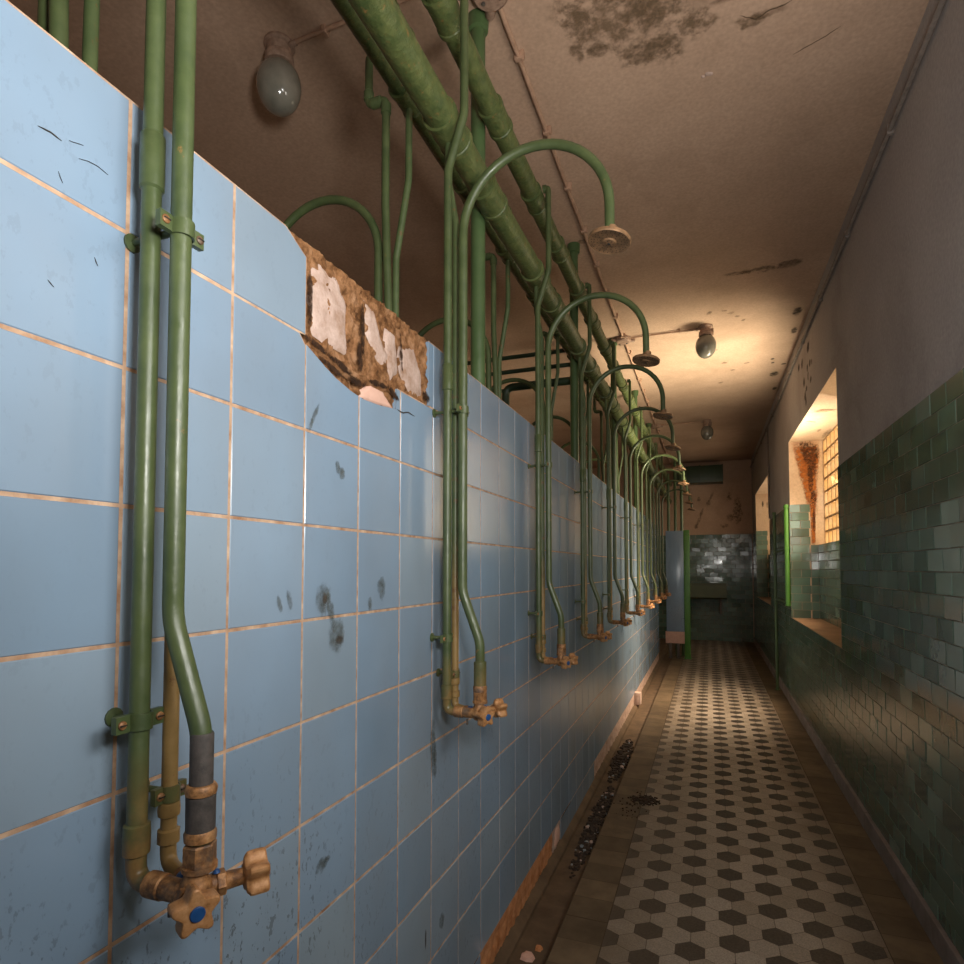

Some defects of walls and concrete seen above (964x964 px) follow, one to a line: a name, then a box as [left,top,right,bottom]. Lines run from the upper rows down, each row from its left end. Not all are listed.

leakage [561,0,716,64]
crack [743,0,792,20]
crack [39,126,108,175]
spalling [290,231,429,408]
leakage [320,591,343,645]